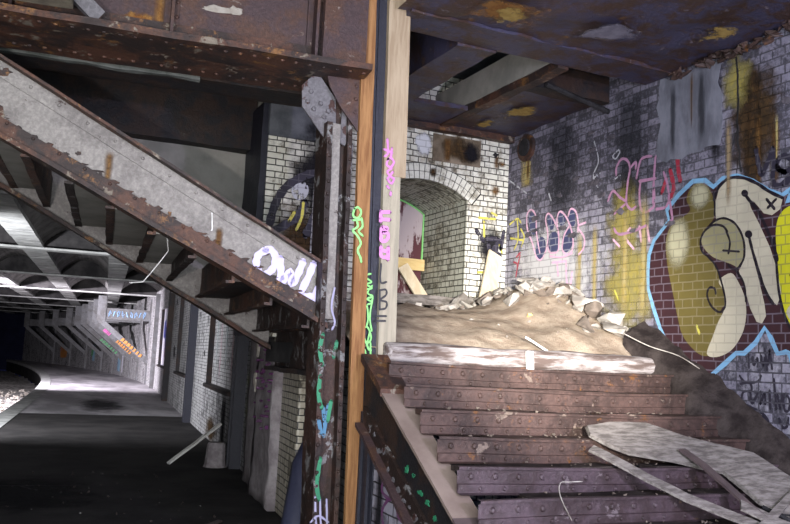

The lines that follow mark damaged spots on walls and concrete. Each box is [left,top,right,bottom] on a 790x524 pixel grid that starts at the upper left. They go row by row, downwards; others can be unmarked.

corrosion [470,0,551,27]
corrosion [99,154,112,179]
leakage [415,133,481,168]
leakage [552,129,571,208]
leakage [606,105,649,327]